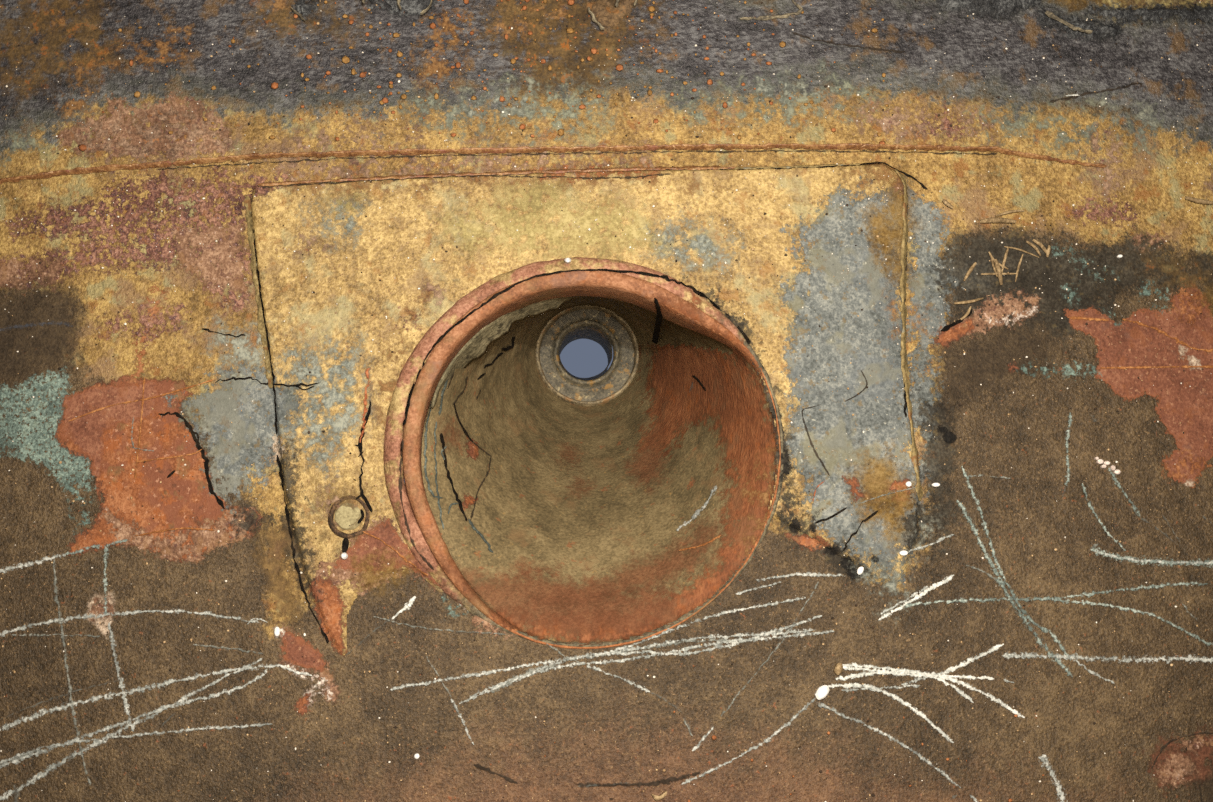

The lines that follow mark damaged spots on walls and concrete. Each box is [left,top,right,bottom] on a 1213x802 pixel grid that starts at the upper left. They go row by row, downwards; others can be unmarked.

crack [202,328,245,337]
crack [215,377,318,390]
rust [0,0,781,716]
crack [159,412,225,509]
peeling [63,478,96,535]